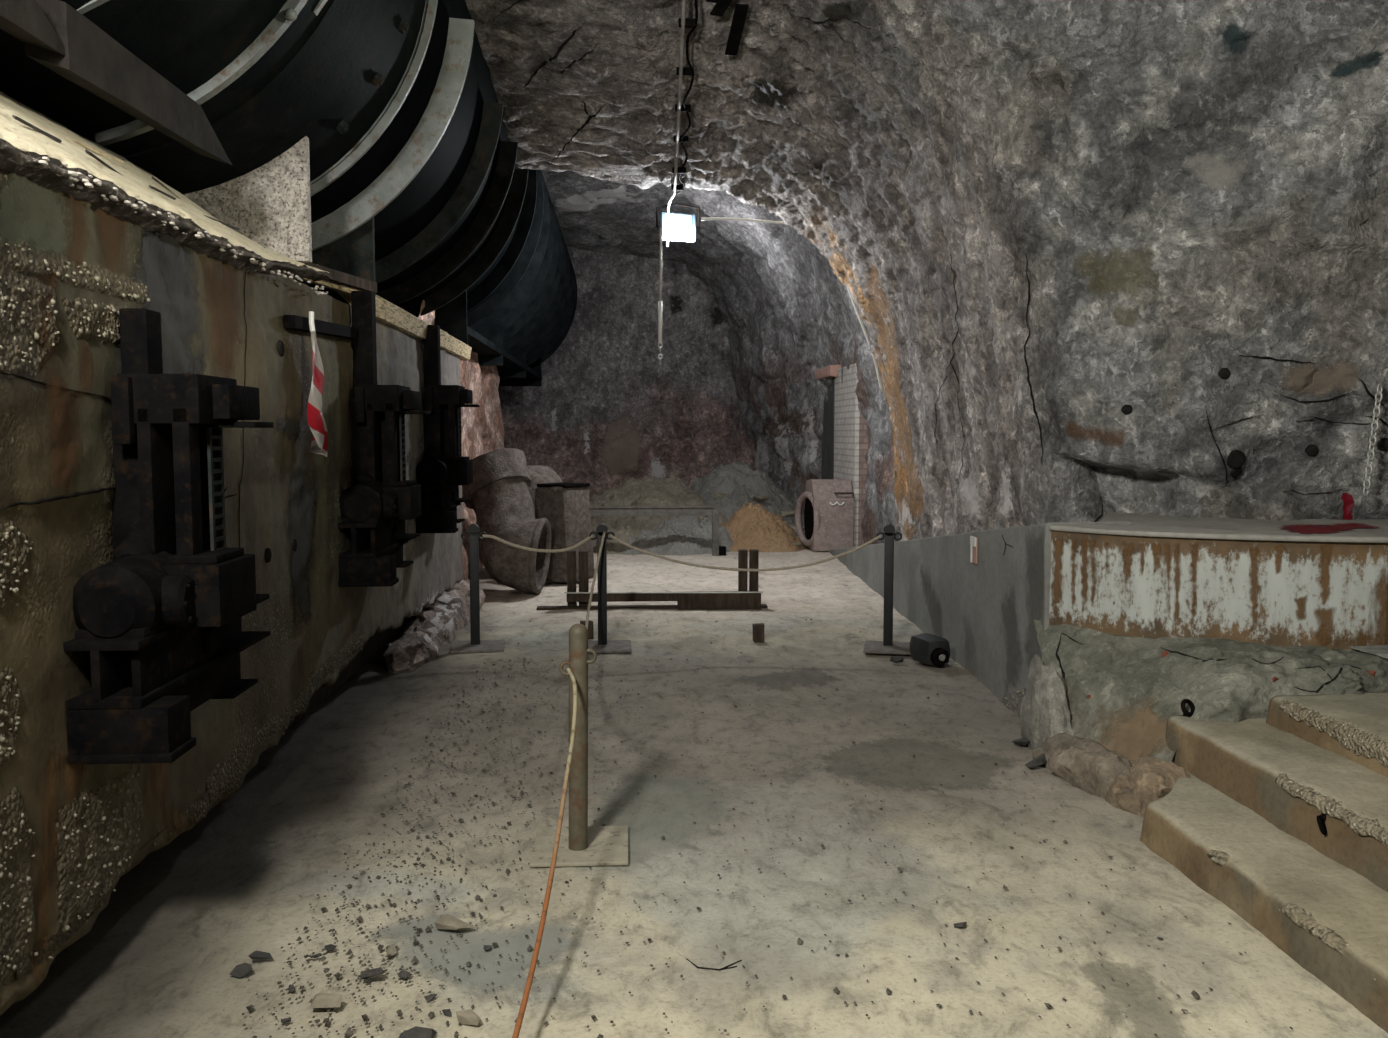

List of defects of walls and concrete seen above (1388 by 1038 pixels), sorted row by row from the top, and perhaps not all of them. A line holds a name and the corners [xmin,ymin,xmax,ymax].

spalling [0,138,332,379]
crack [0,486,116,510]
rust [1051,539,1198,621]
rust [1249,547,1259,630]
rust [1275,546,1284,573]
rust [1295,544,1388,646]
spalling [1277,699,1388,767]
spalling [1275,772,1388,848]
spalling [0,786,35,989]
spalling [55,764,143,947]
spalling [1207,849,1230,867]
spalling [1279,903,1348,955]